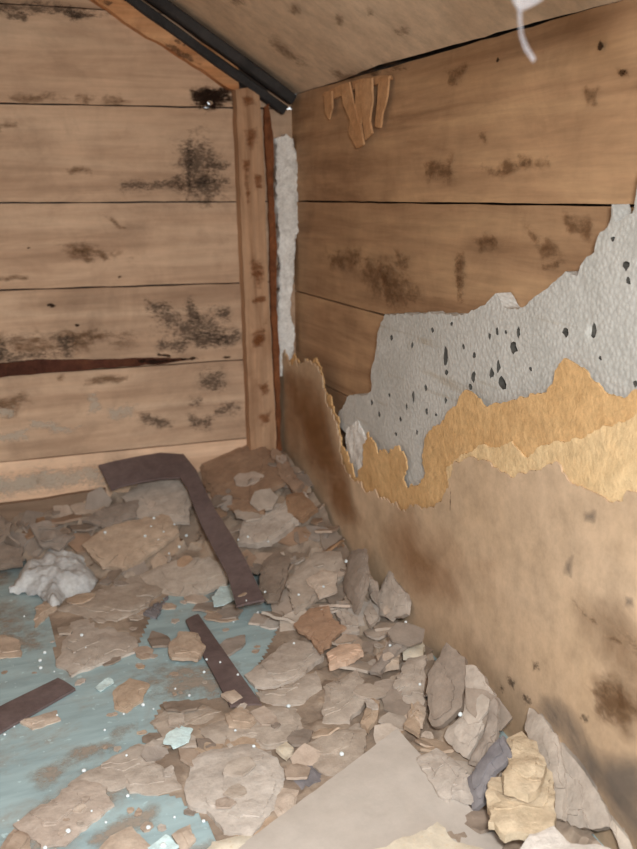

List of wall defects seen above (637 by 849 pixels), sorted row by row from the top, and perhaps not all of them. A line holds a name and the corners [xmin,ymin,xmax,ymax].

water stain [123,143,229,202]
water stain [0,334,102,362]
crack [139,353,198,365]
water stain [148,301,240,350]
water stain [550,710,597,778]